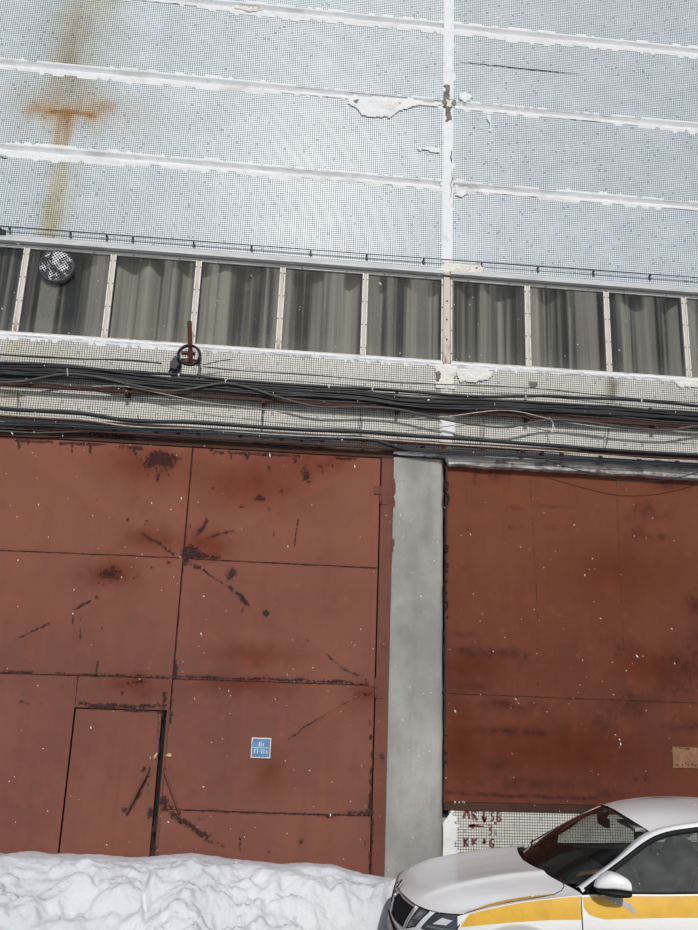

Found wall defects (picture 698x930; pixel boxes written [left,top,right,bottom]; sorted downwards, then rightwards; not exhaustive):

peeling [435,363,479,382]
rust [15,432,180,482]
rust [141,532,250,611]
rust [55,653,369,753]
rust [147,768,374,874]